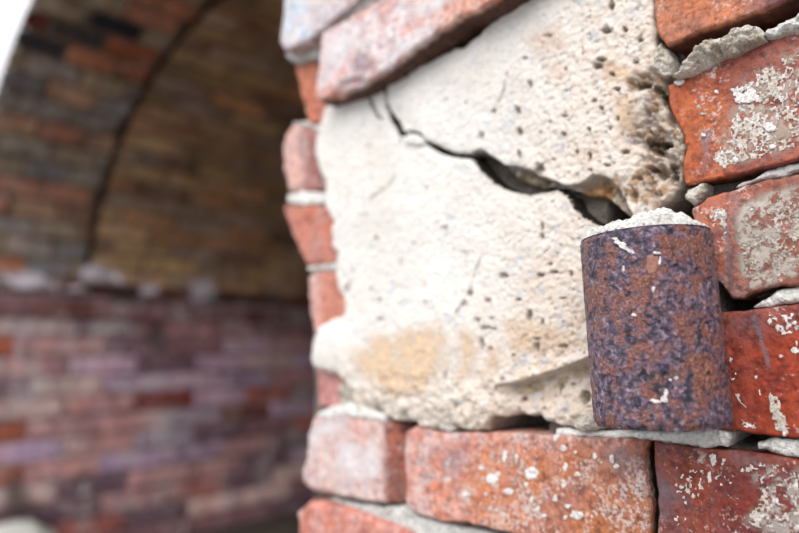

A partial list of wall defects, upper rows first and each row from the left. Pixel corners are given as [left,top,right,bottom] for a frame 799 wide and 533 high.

crack [493,72,508,112]
damp [713,55,799,169]
crack [369,91,606,226]
corrosion [645,254,659,274]
damp [701,193,799,284]